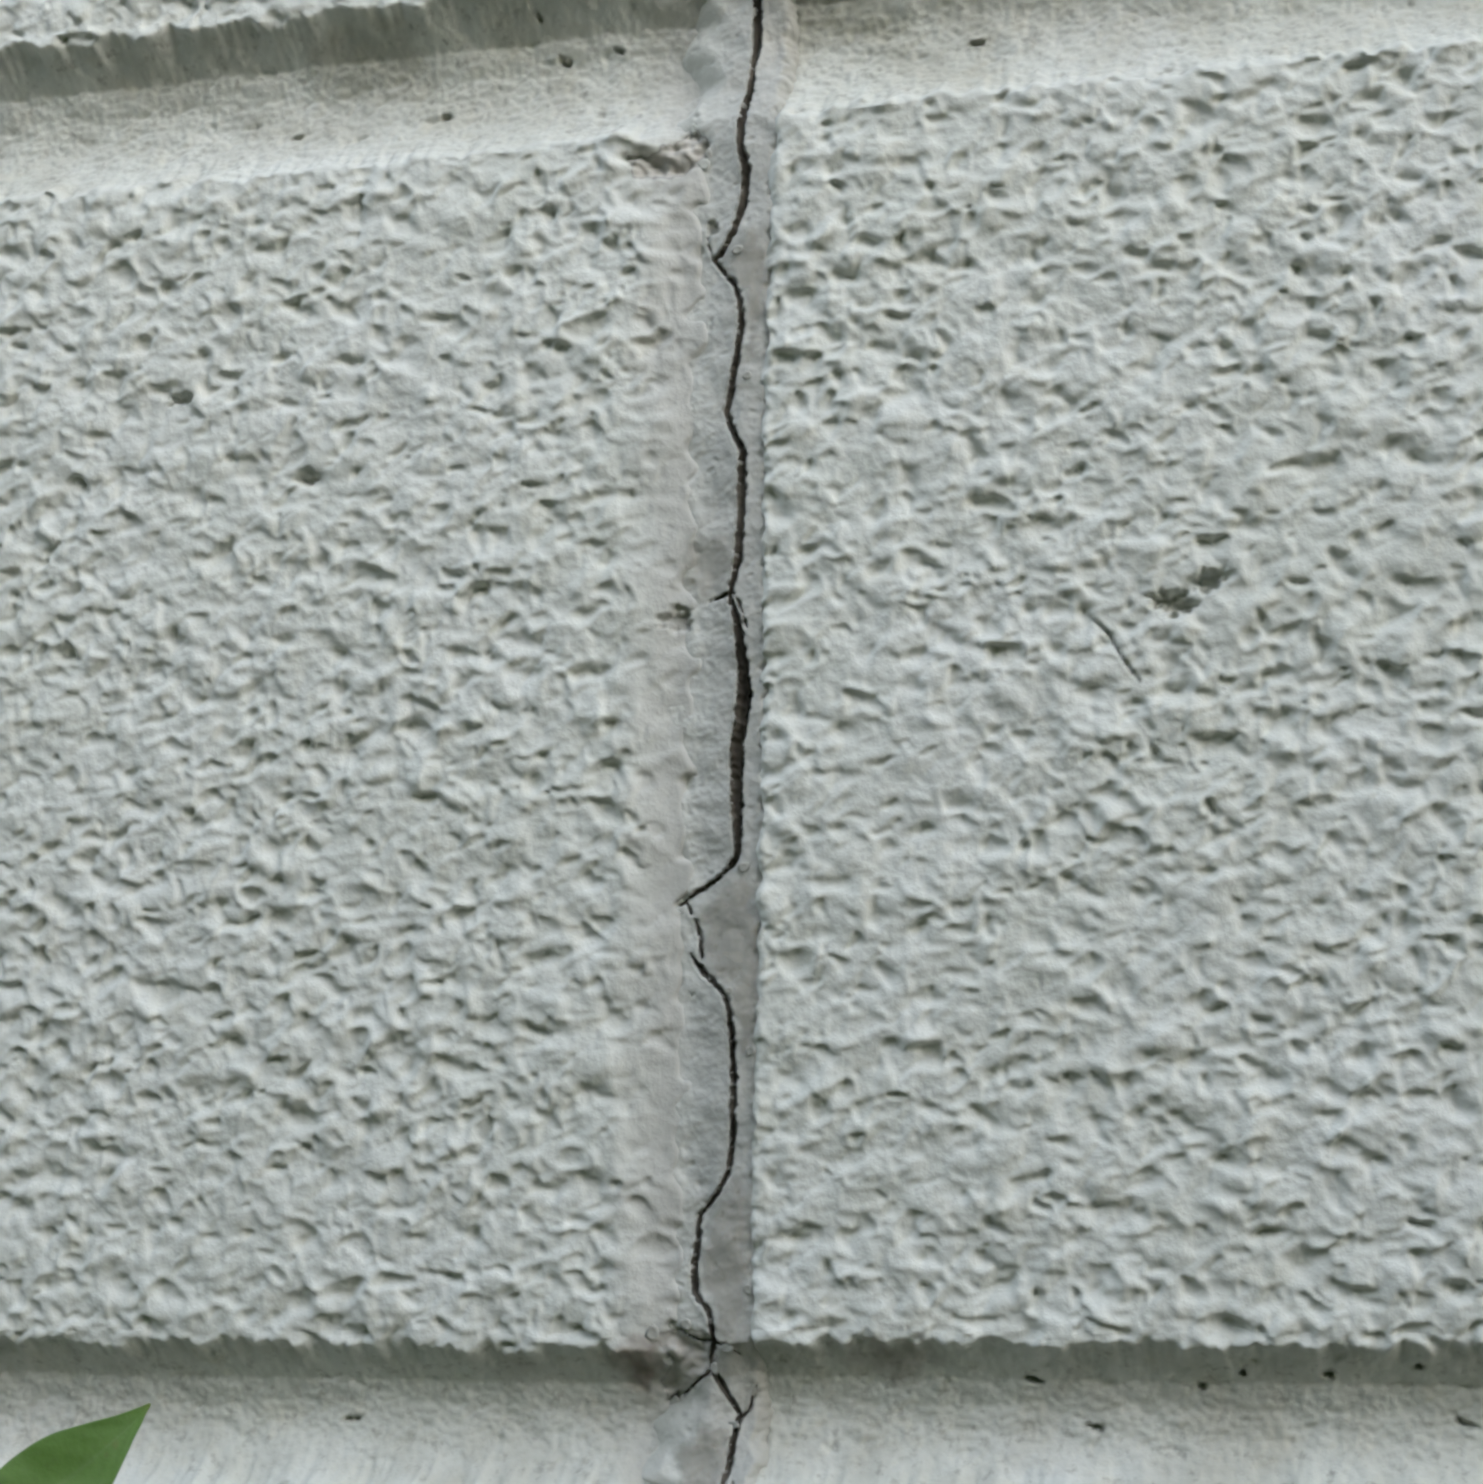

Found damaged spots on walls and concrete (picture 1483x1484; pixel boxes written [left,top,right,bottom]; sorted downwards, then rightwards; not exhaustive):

crack [672,0,762,1484]